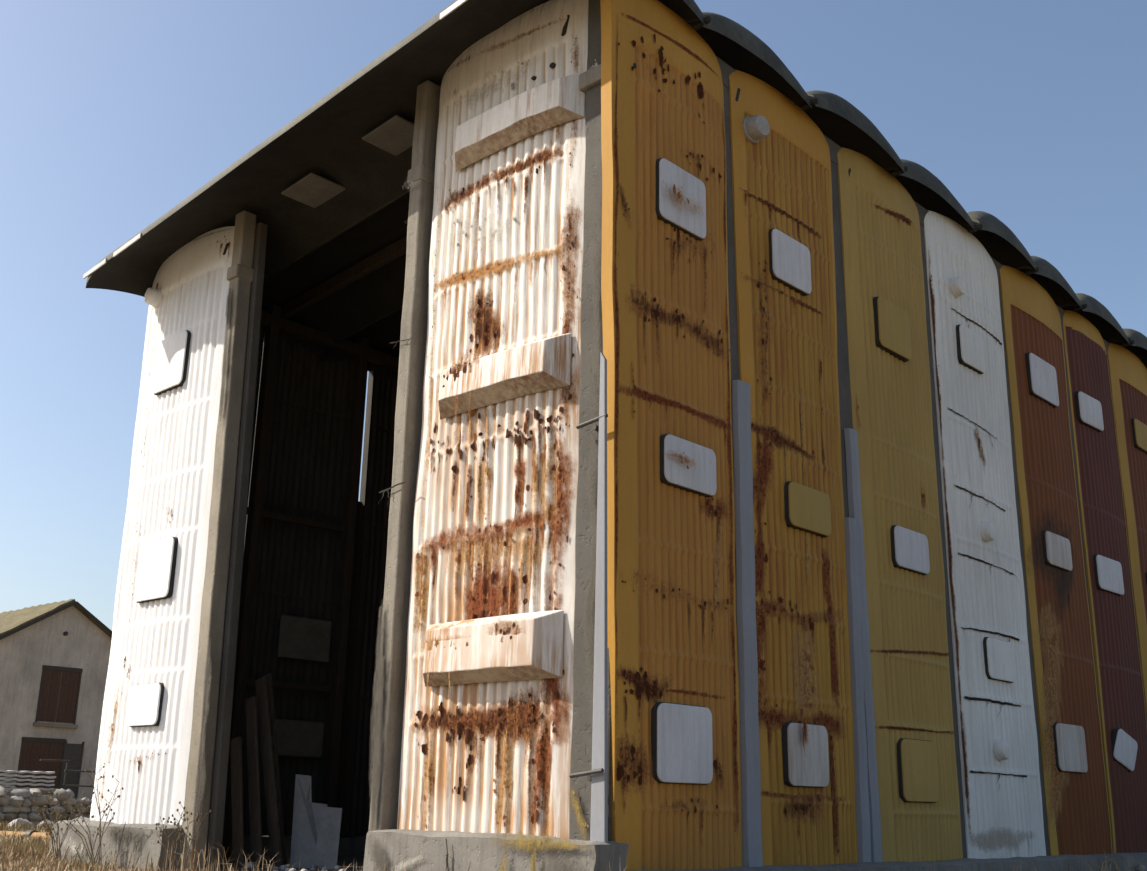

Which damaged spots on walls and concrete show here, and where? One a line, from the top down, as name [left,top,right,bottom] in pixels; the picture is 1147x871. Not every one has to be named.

corrosion [414,373,576,652]
corrosion [429,207,580,403]
corrosion [445,120,577,246]
corrosion [614,13,739,842]
corrosion [741,259,823,402]
corrosion [745,190,821,240]
corrosion [751,389,846,856]
corrosion [412,670,569,835]